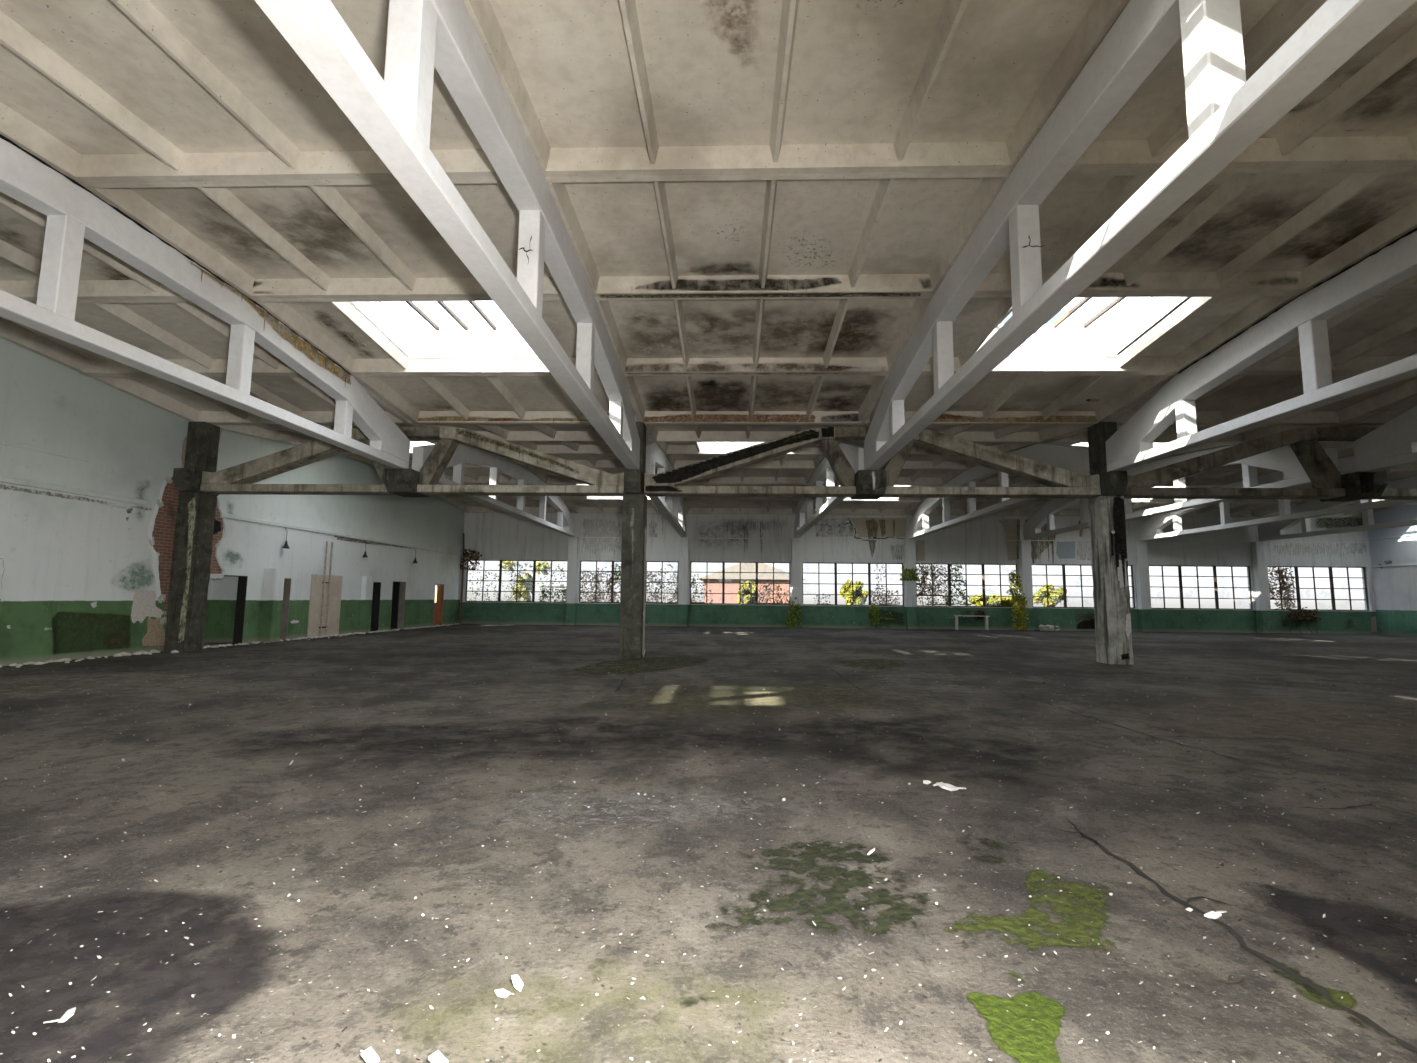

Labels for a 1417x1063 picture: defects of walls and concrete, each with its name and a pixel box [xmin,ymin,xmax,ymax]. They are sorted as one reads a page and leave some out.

water stain [1277,204,1379,265]
water stain [599,236,931,411]
water stain [645,427,834,492]
flaking render [210,495,228,579]
crack [1056,818,1417,1052]